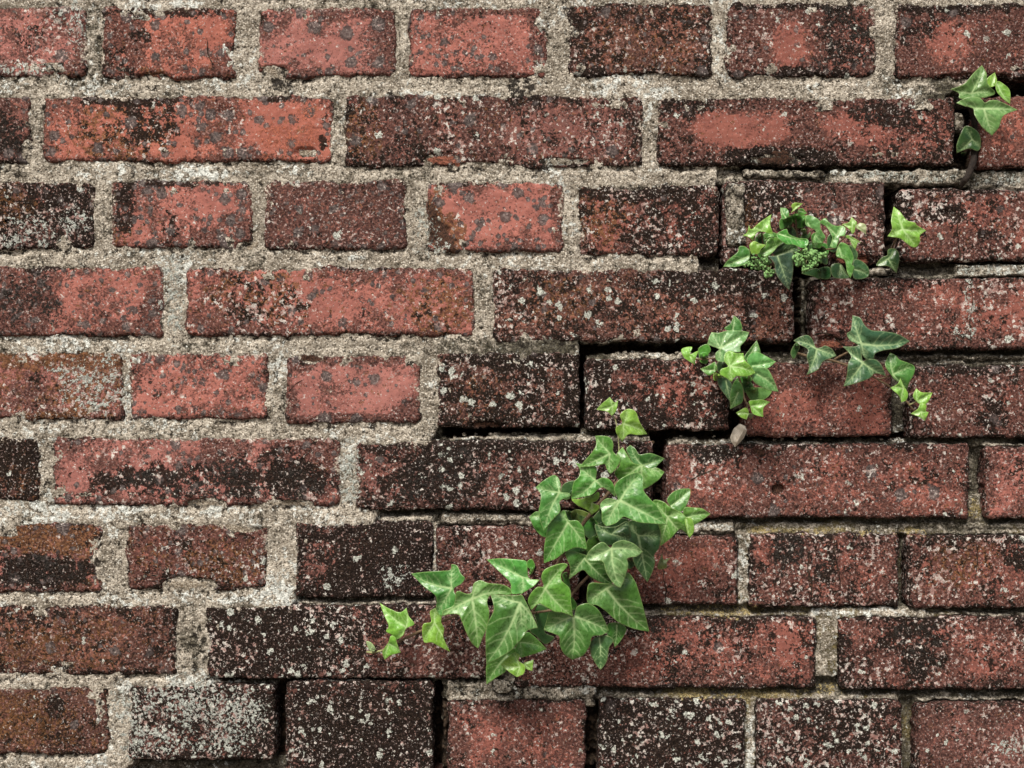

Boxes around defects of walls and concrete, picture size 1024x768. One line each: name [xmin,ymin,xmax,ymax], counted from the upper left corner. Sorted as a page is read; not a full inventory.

crack [740,165,829,173]
crack [950,86,1024,260]
crack [443,187,909,439]
crack [649,409,905,500]
crack [577,570,589,604]
crack [802,536,841,602]
crack [434,679,449,768]
crack [585,700,599,768]